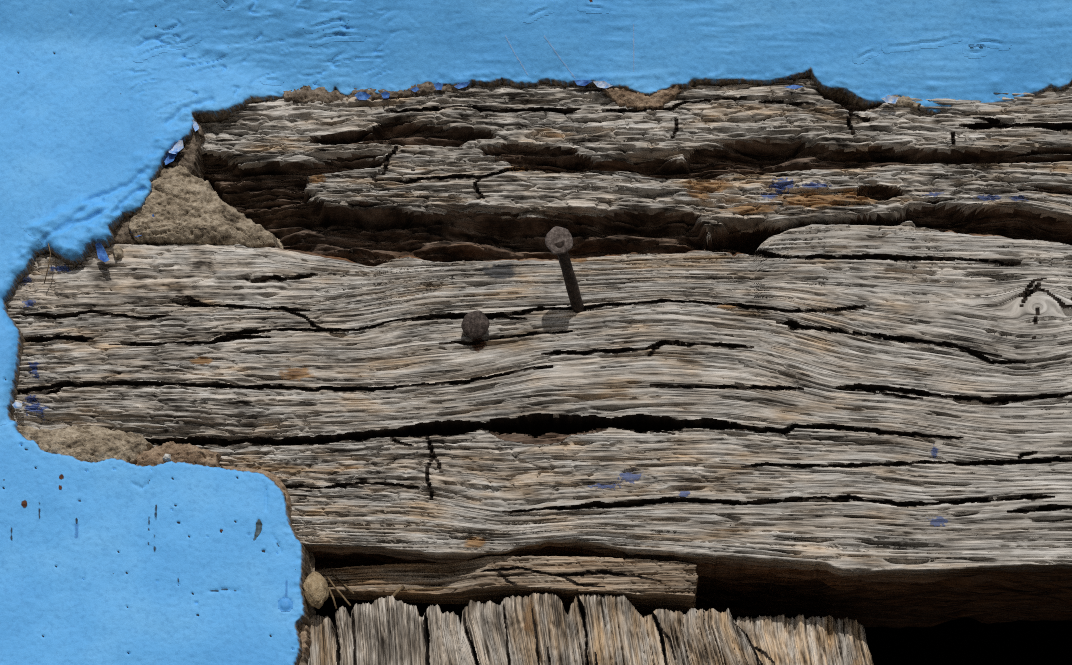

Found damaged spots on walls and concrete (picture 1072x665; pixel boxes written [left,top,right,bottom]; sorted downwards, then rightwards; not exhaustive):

flaking render [283,81,470,105]
flaking render [574,80,686,112]
flaking render [881,95,921,111]
peeling [95,120,283,262]
crack [16,273,1026,395]
crack [835,383,1072,405]
peeling [17,425,292,515]
crack [145,413,1072,500]
crack [502,494,1072,514]